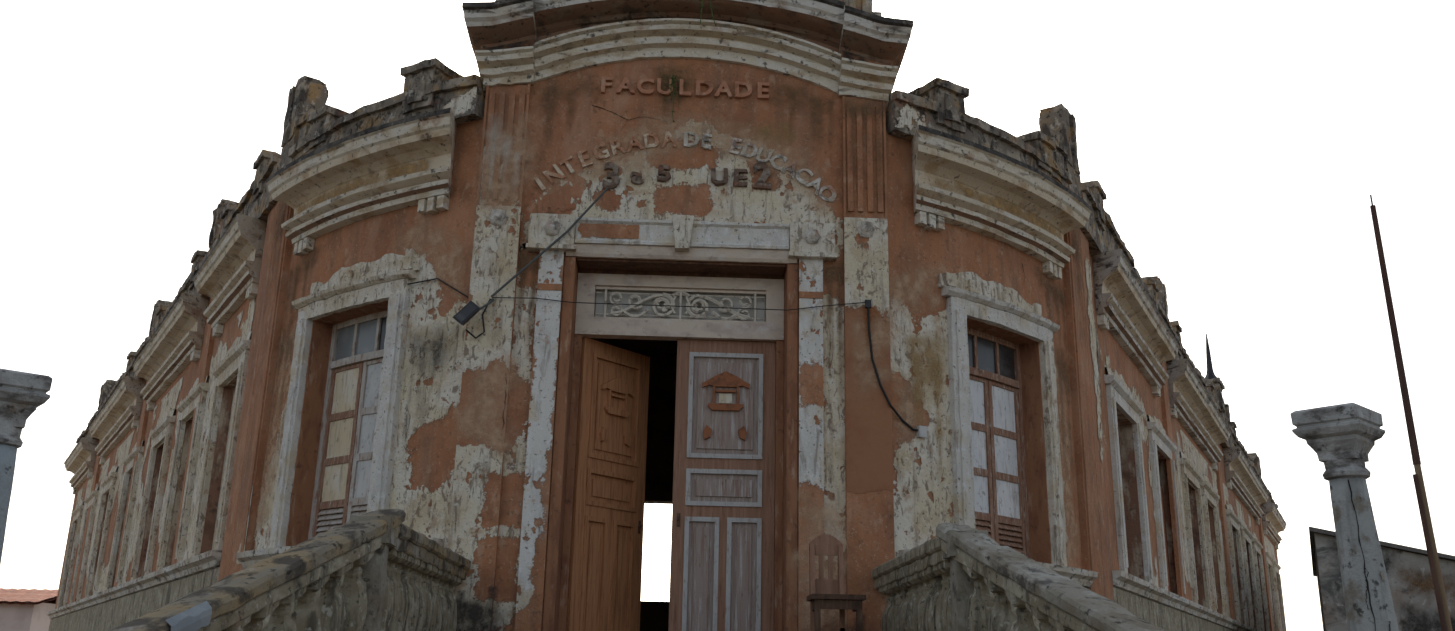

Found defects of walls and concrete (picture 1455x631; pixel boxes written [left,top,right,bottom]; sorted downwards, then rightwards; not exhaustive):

peeling [389,119,954,631]
crack [1348,480,1391,631]